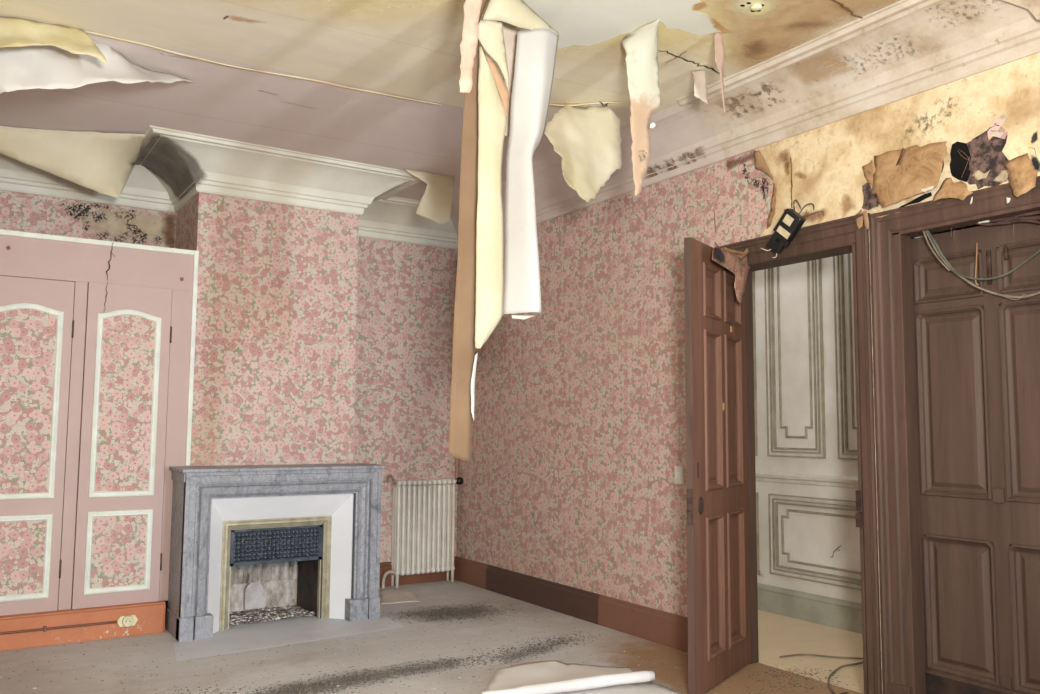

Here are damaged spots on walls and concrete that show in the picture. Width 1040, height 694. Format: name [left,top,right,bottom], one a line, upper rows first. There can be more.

peeling [523,0,729,49]
damp [616,20,683,38]
damp [692,0,897,59]
damp [730,84,781,117]
peeling [754,52,1040,237]
damp [62,203,175,247]
peeling [712,241,751,304]